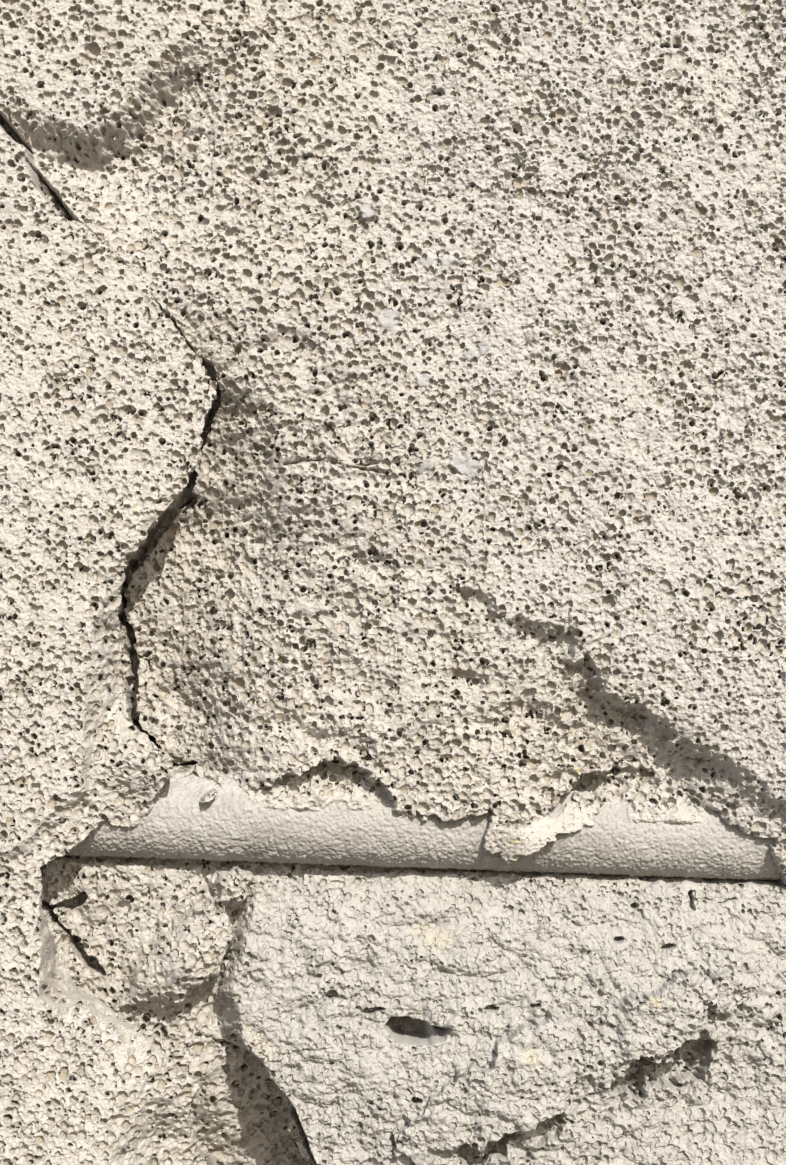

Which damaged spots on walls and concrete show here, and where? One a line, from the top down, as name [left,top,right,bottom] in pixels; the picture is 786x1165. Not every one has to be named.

crack [0,110,223,767]
spalling [39,284,786,1165]